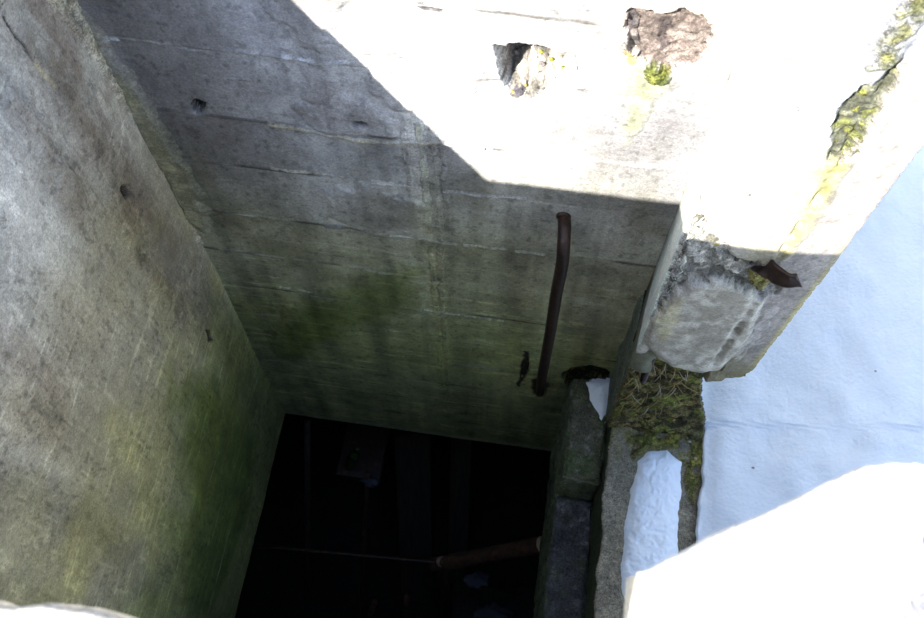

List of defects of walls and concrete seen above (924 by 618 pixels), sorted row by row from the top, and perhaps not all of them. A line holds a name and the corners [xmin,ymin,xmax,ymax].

spalling [494,42,580,100]
spalling [622,7,714,86]
leakage [260,0,546,413]
spalling [651,184,782,318]